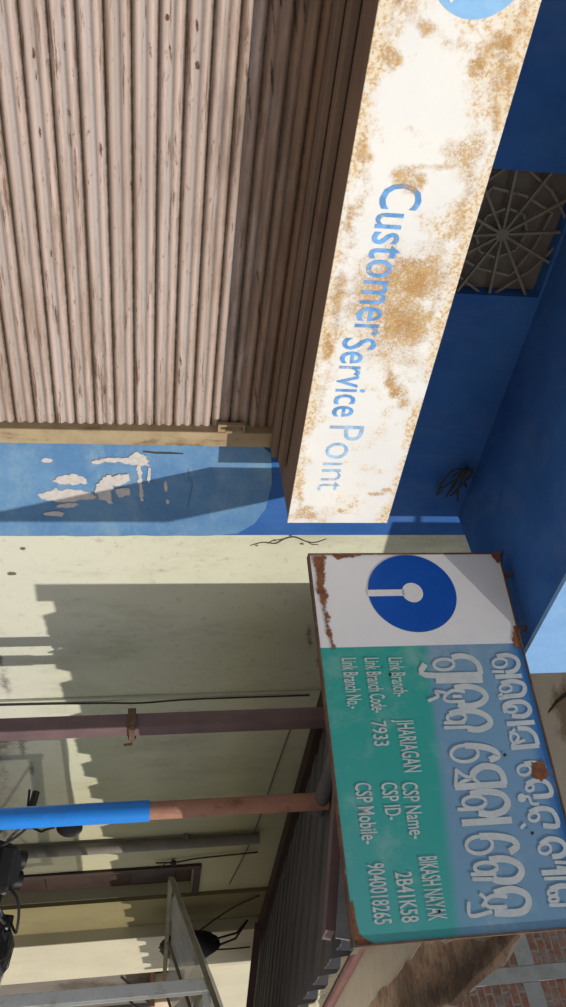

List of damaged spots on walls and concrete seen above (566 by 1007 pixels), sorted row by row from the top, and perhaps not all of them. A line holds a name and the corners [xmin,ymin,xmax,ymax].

peeling [37,452,151,517]
crack [250,535,326,546]
flaking render [368,935,521,1007]